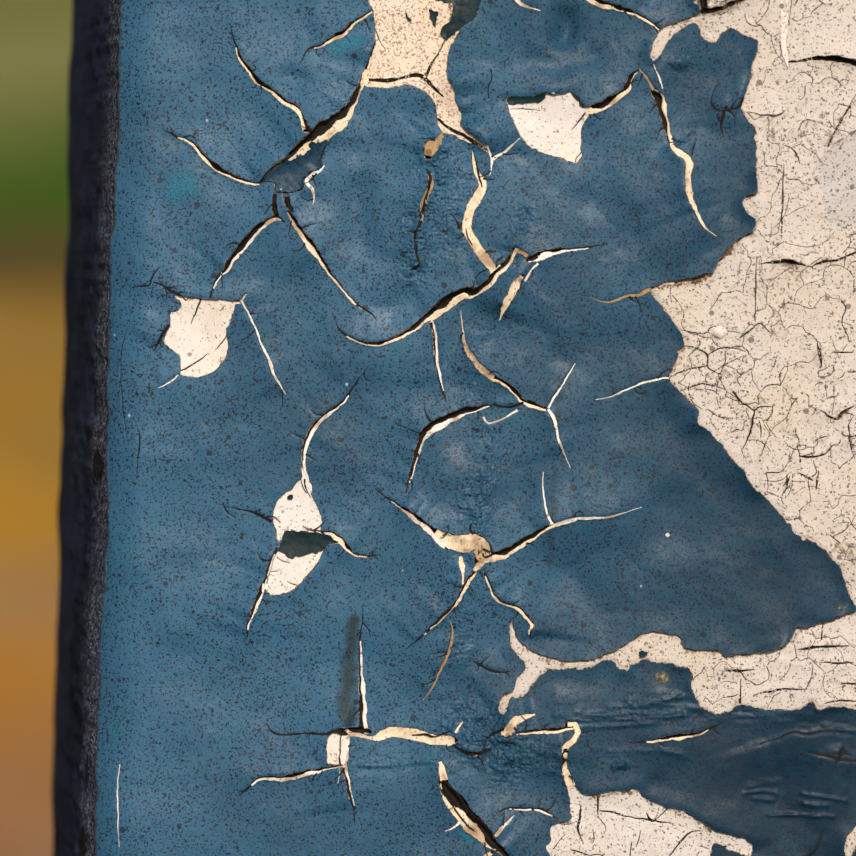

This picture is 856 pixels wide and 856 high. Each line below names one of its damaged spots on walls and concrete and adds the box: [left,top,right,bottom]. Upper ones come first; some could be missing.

crack [515,0,541,11]
peeling [360,0,488,152]
peeling [165,295,241,377]
crack [165,10,641,700]
peeling [499,0,856,714]
crack [585,0,856,561]
peeling [262,467,338,595]
crack [114,764,122,839]
peeling [327,729,349,768]
crack [237,605,591,856]
peeling [546,785,752,856]
crack [628,623,856,747]